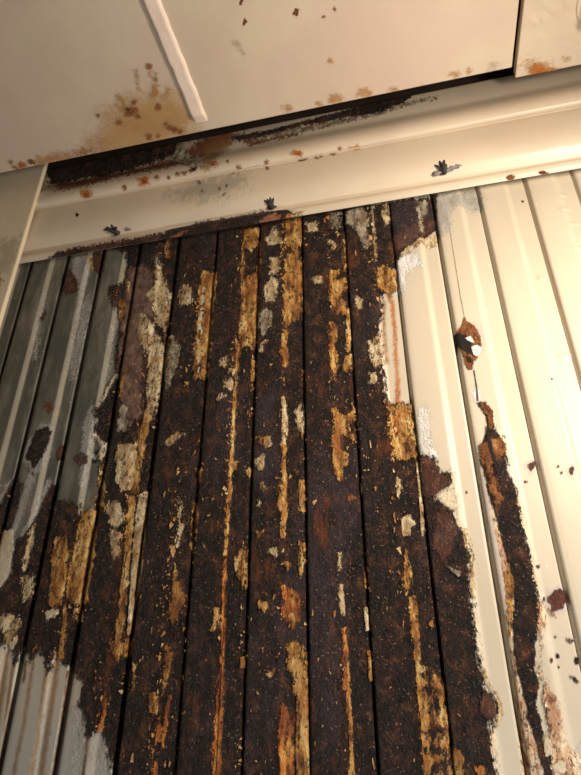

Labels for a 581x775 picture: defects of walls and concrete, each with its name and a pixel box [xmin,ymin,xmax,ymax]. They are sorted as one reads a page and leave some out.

corrosion [520,64,555,74]
corrosion [9,86,438,198]
corrosion [0,192,504,775]
peeling [415,402,439,462]
peeling [437,487,461,512]
corrosion [477,401,581,775]